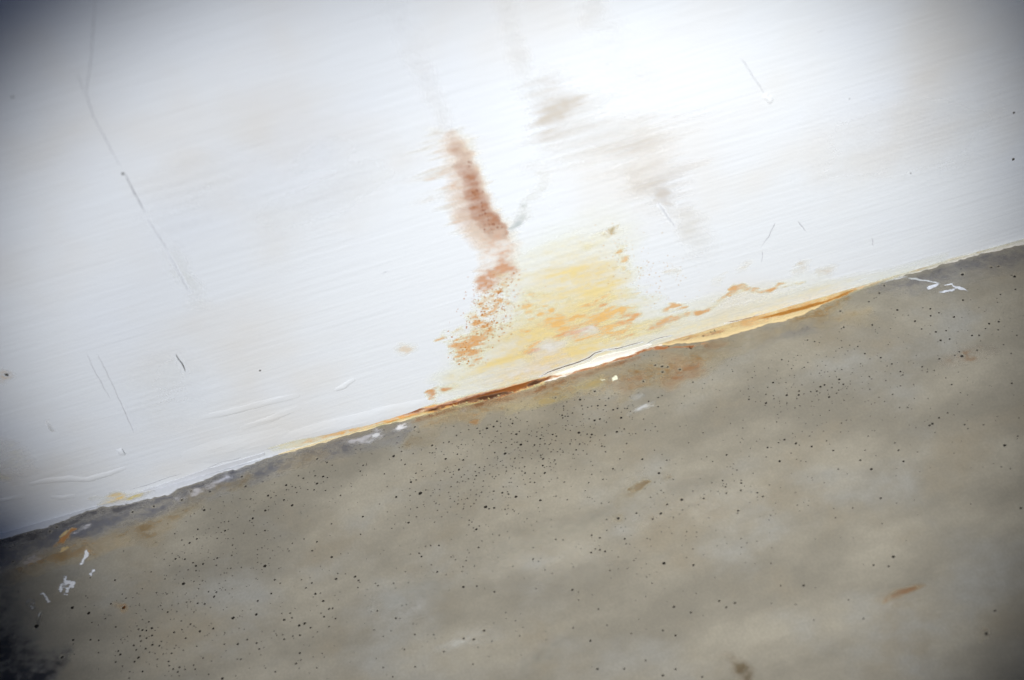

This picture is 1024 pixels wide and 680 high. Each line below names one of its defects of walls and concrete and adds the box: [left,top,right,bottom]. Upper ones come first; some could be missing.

rust [424,133,519,367]
rust [292,279,864,446]
crack [542,335,671,376]